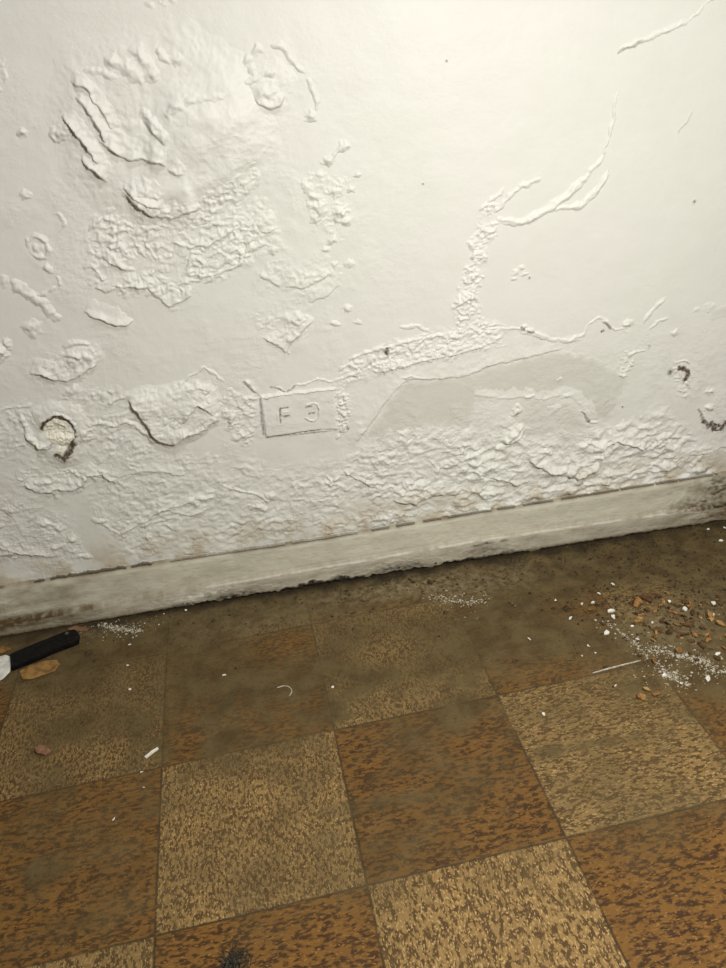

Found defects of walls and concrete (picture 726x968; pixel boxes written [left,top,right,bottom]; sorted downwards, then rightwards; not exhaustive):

spalling [17,399,96,469]
damp [149,545,540,611]
damp [0,598,103,636]